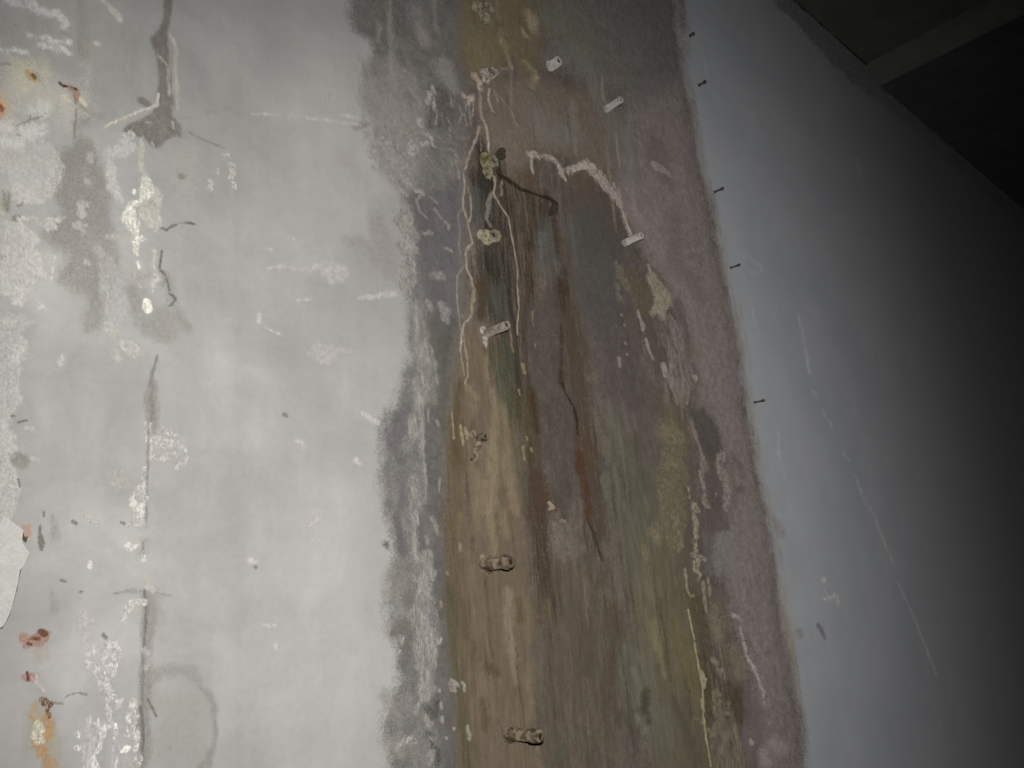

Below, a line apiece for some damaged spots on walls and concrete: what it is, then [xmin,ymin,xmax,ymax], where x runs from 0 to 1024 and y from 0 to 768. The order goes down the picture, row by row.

peeling [0,0,73,67]
corrosion [59,81,89,113]
water stain [37,0,238,365]
crack [154,221,195,336]
crack [497,166,561,254]
peeling [0,97,89,629]
crack [557,323,579,436]
water stain [329,0,813,768]
crack [120,354,161,562]
crack [37,511,78,551]
corrosion [17,628,68,768]
crack [114,587,172,768]